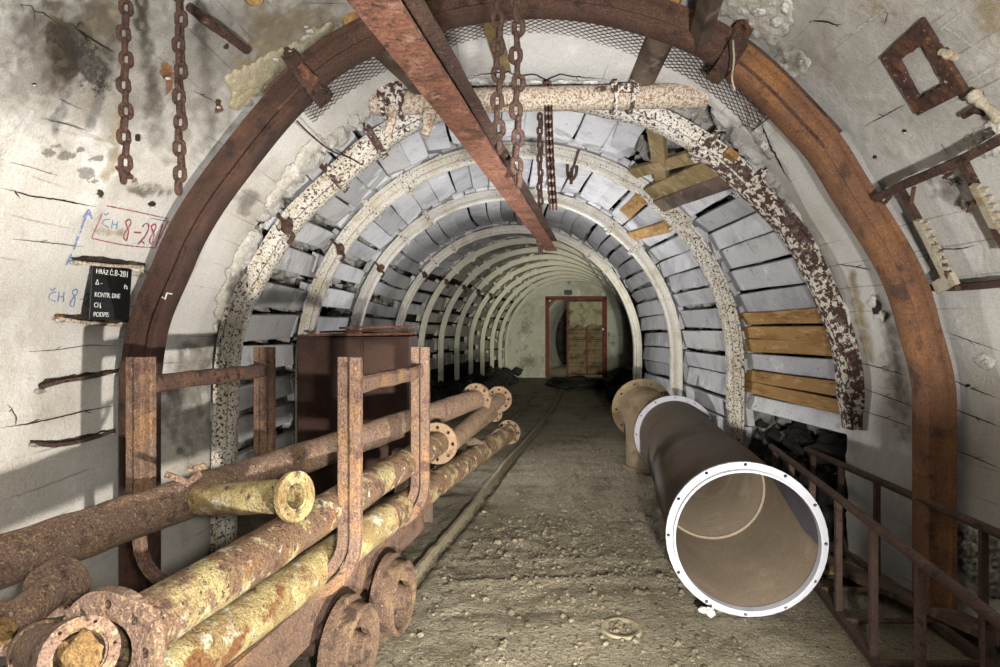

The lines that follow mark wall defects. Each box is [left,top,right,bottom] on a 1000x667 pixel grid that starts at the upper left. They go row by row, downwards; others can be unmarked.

crack [20,4,114,52]
damp [46,17,115,100]
crack [2,163,95,207]
rust [309,325,416,336]